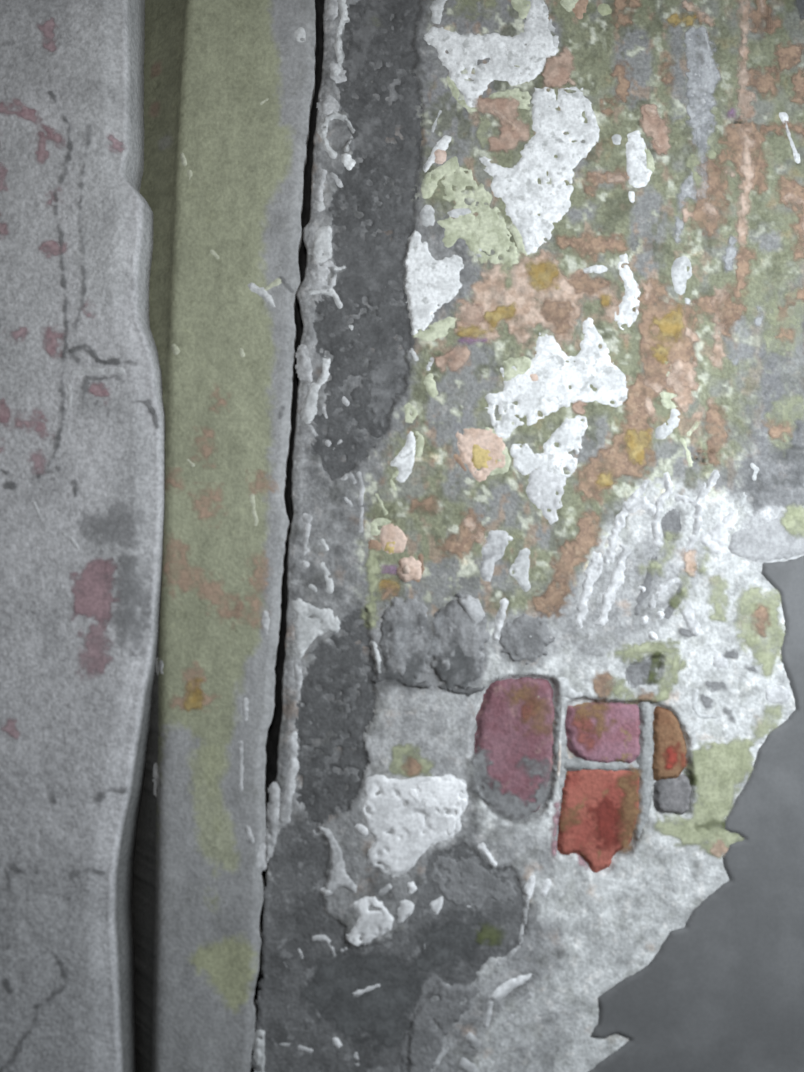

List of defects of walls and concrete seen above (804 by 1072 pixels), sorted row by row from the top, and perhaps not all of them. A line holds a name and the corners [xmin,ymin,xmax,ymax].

peeling [612,130,655,203]
crack [5,91,130,496]
spalling [294,0,600,554]
peeling [583,253,641,330]
rust [533,0,804,617]
crack [143,400,159,428]
crack [266,0,325,828]
peeling [453,317,628,524]
peeling [245,470,804,1072]
rust [593,672,612,702]
rust [636,692,655,704]
crack [255,869,267,1019]